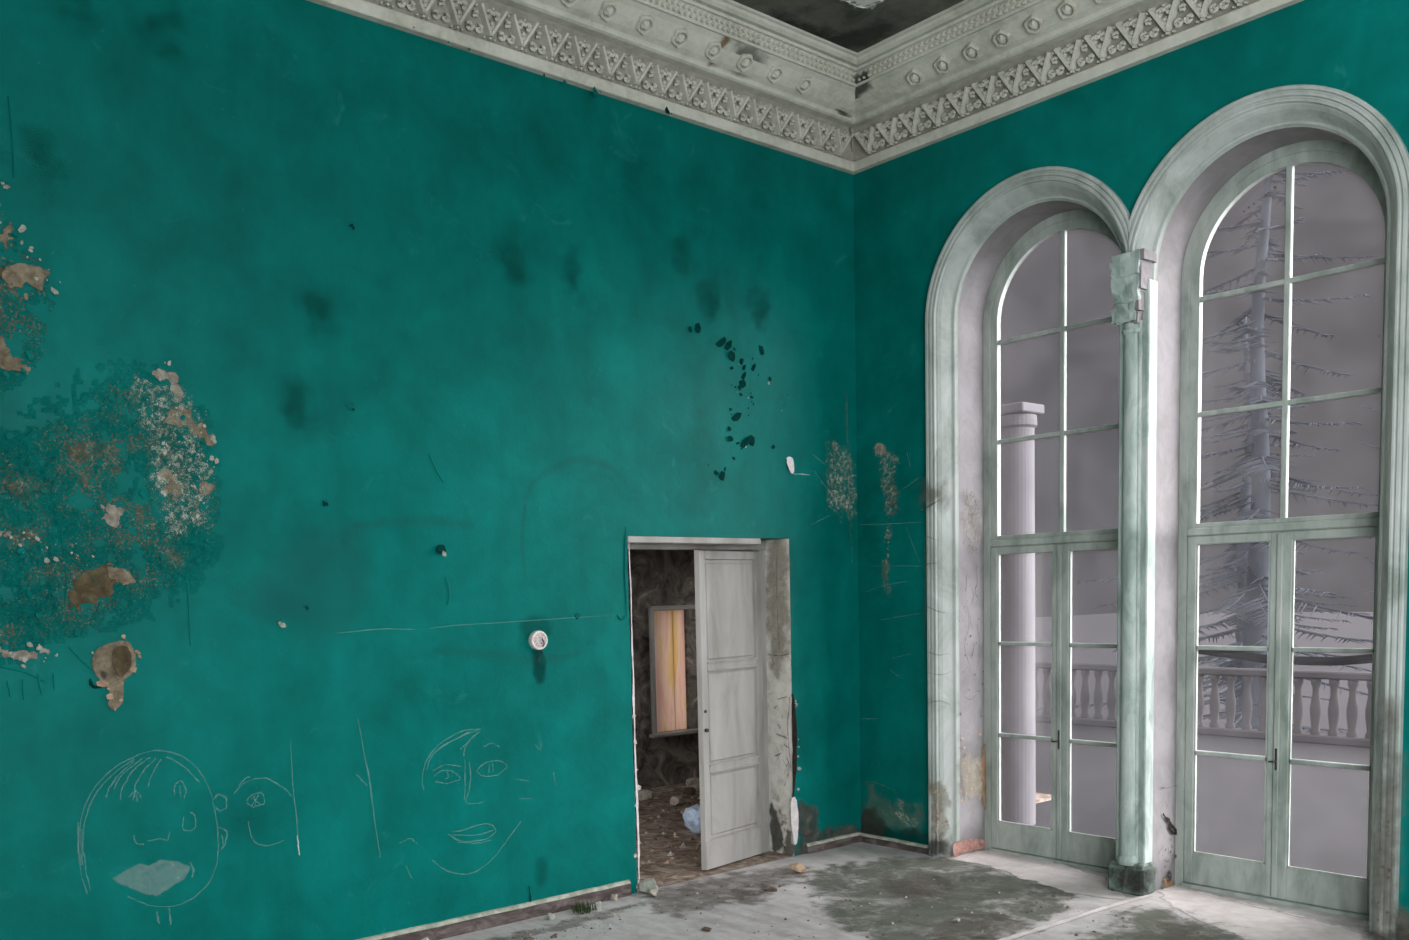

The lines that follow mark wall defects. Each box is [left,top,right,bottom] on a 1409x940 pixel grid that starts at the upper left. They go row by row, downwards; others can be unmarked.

peeling [0,214,225,711]
peeling [708,337,807,481]
peeling [826,397,857,554]